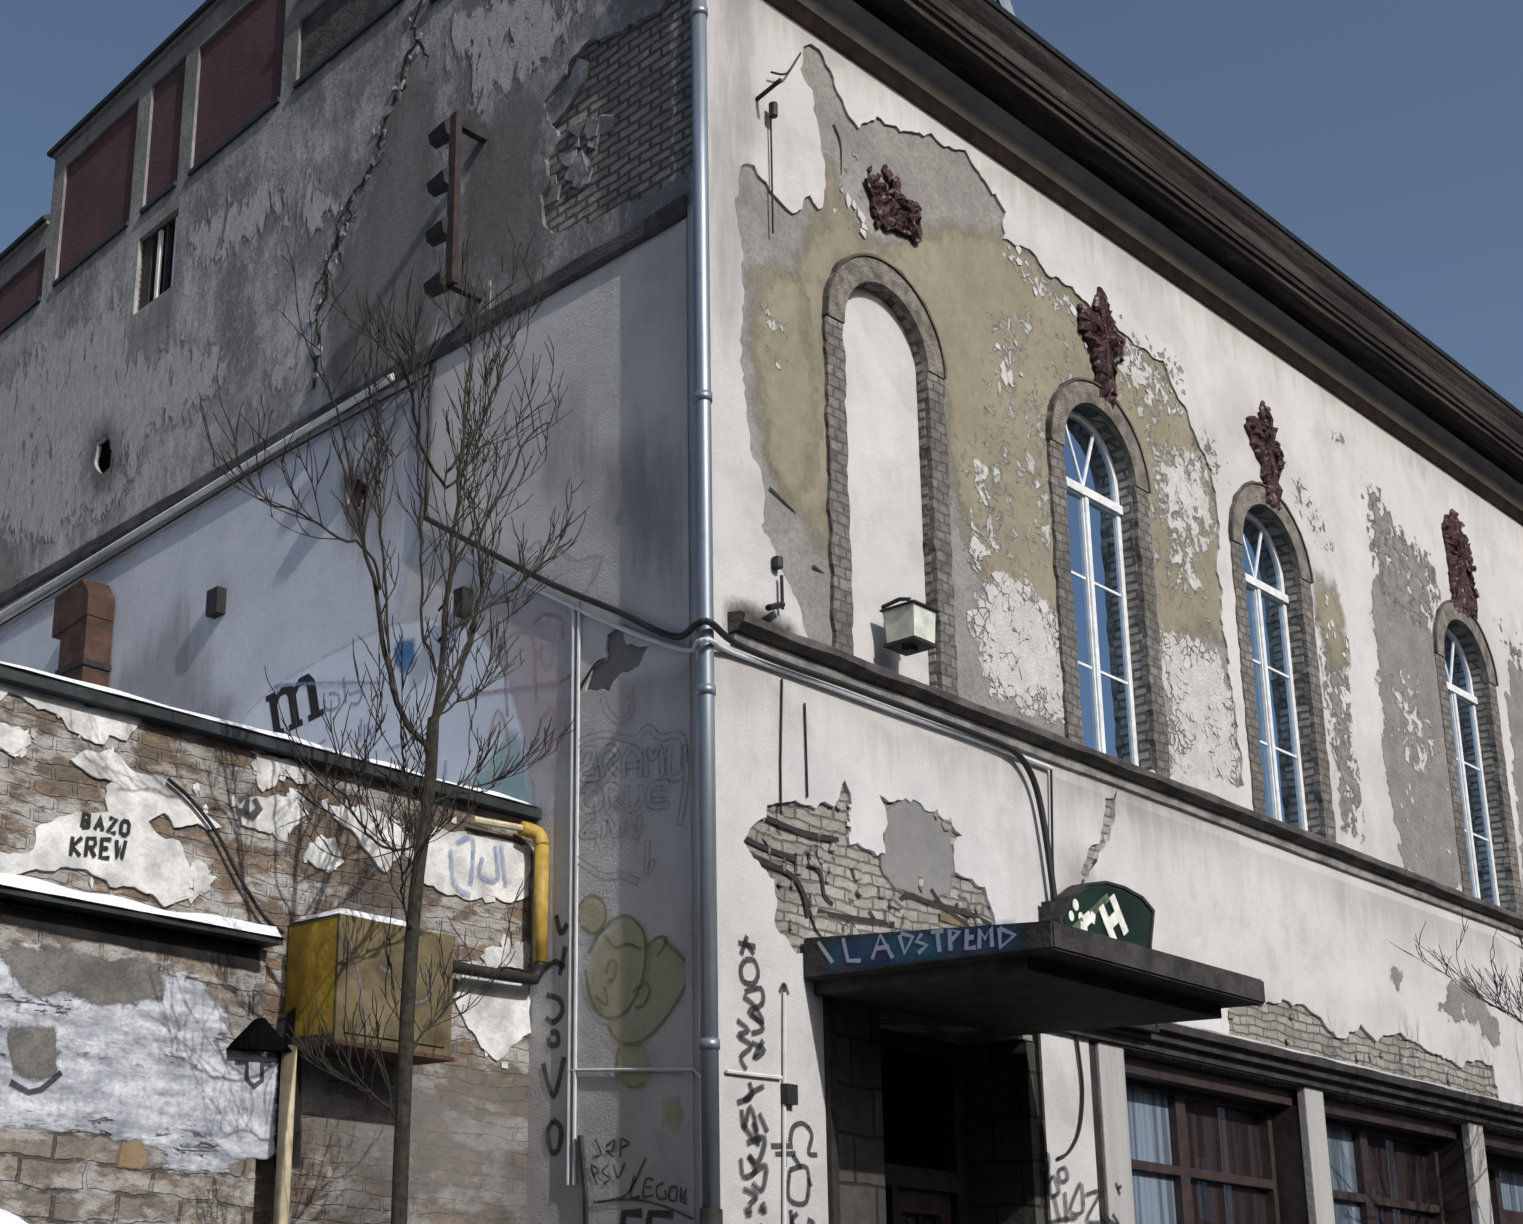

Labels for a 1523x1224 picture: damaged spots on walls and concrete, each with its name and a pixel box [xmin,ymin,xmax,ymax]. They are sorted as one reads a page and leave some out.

crack [305,0,429,394]
spalling [543,18,653,233]
flaking render [735,45,1096,737]
flaking render [0,682,221,908]
flaking render [230,749,534,903]
flaking render [453,933,532,1069]
spalling [744,784,992,954]
flaking render [1114,314,1242,789]
peeling [1314,574,1365,843]
spalling [1228,978,1500,1100]
peeling [1361,477,1462,889]
peeling [1495,620,1523,893]